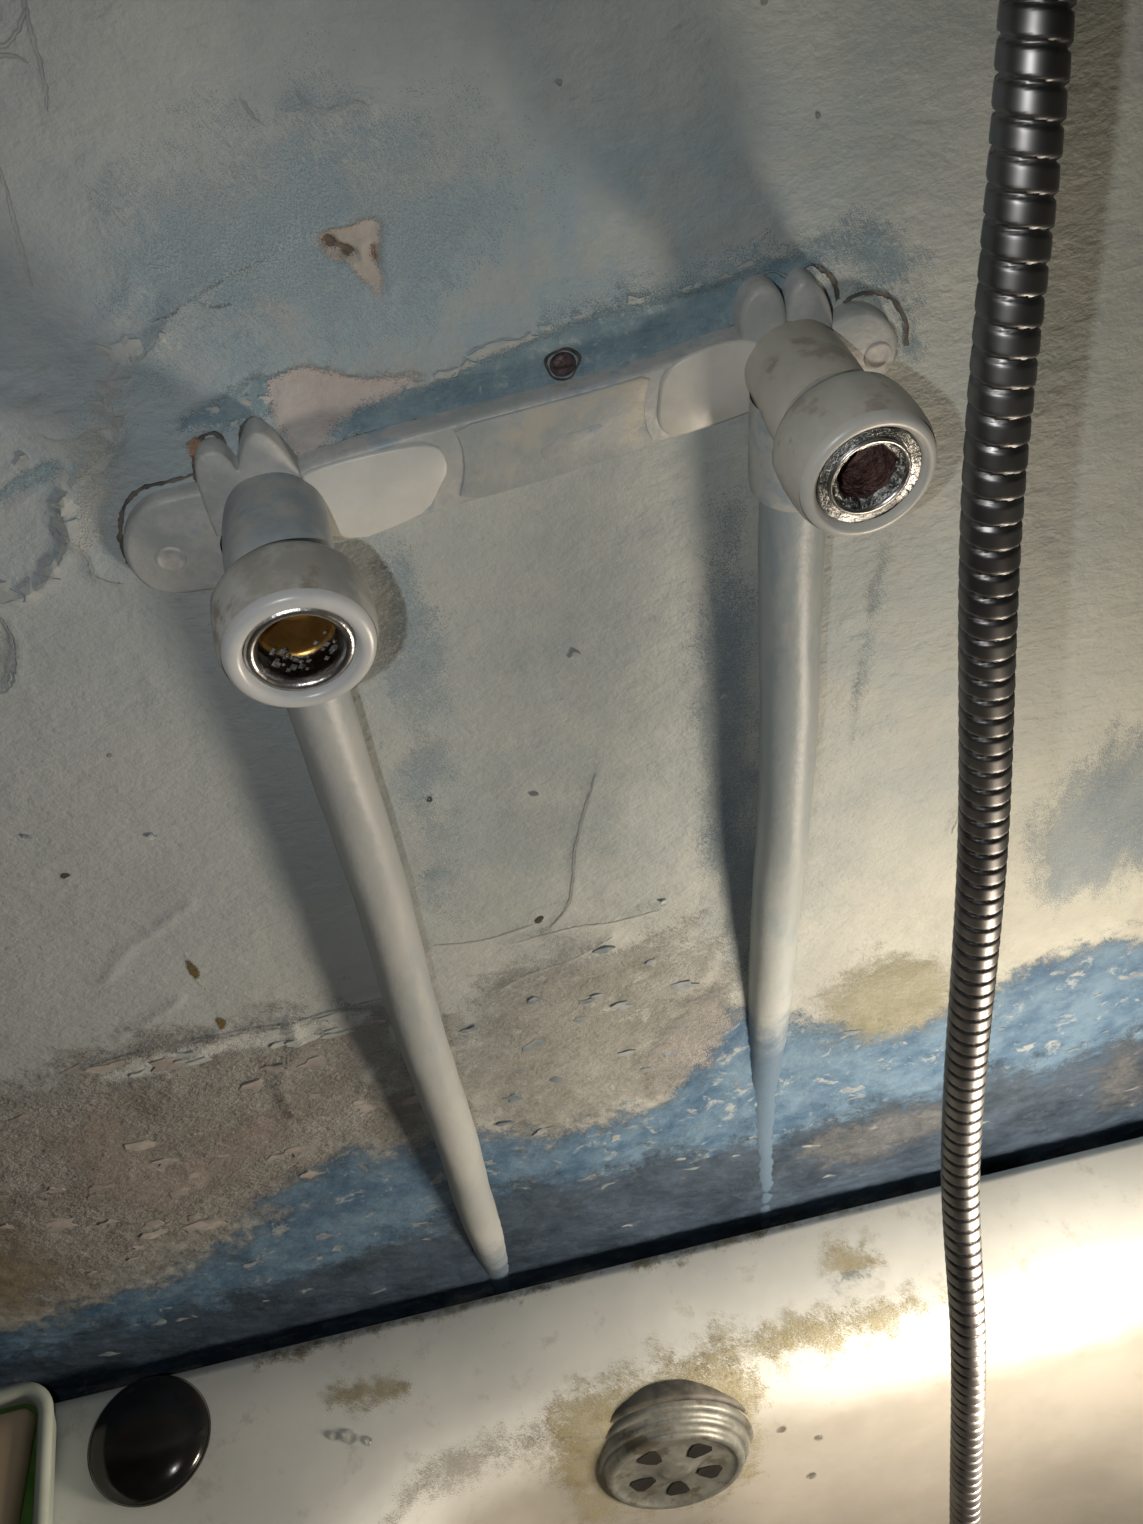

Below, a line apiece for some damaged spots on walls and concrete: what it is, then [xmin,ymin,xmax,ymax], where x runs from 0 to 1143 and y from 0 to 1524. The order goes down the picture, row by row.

peeling [176,205,937,456]
leakage [184,957,206,990]
leakage [803,944,950,1050]
leakage [980,1020,1143,1176]
leakage [0,1083,948,1524]